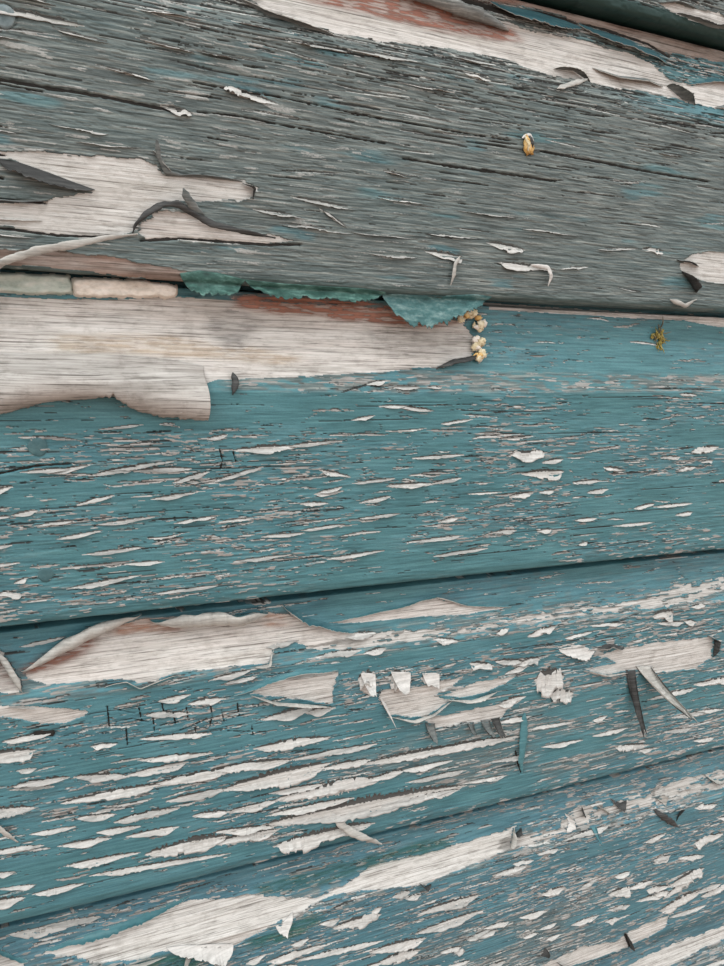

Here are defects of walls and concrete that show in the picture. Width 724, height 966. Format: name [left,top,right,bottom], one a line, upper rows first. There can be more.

peeling [224,86,271,104]
peeling [236,0,724,110]
peeling [0,124,410,245]
peeling [677,251,724,293]
peeling [0,293,491,426]
peeling [97,462,261,500]
peeling [239,442,336,454]
peeling [511,450,562,499]
peeling [73,562,162,589]
peeling [0,577,724,791]
peeling [0,659,573,876]
peeling [0,770,724,966]